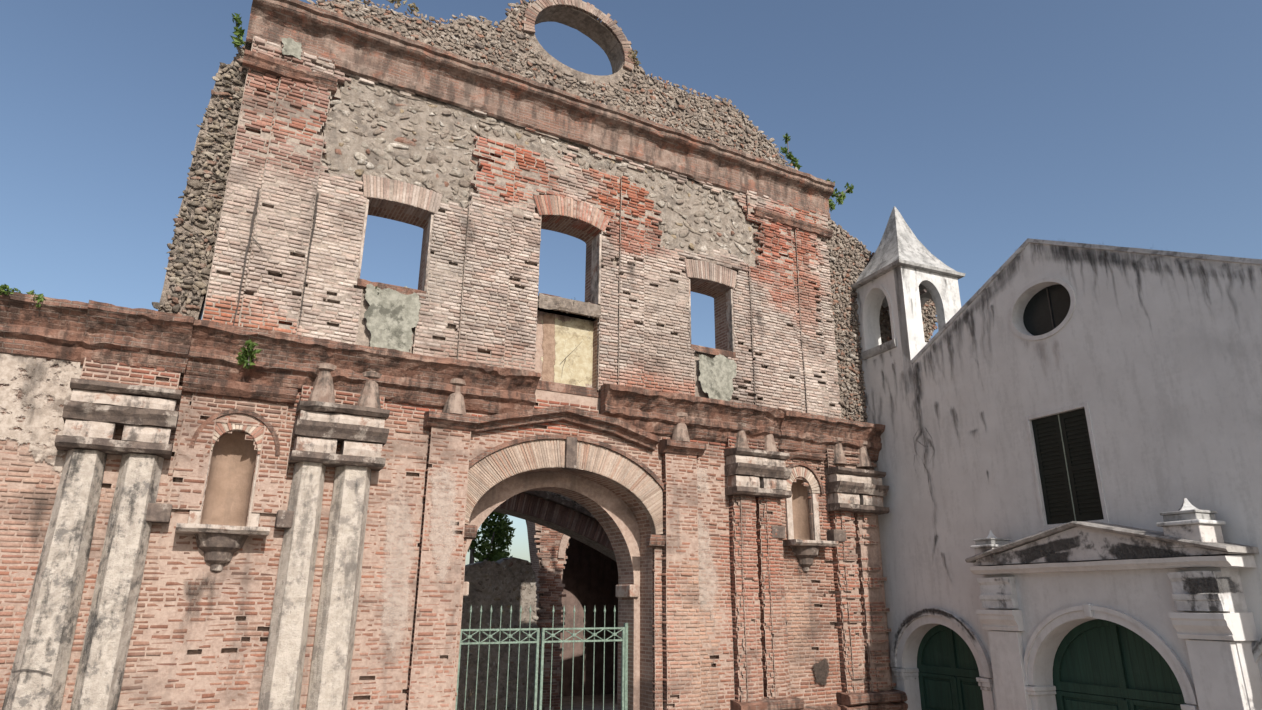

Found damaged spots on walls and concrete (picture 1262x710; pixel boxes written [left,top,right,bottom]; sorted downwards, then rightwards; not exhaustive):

flaking render [0,353,83,477]